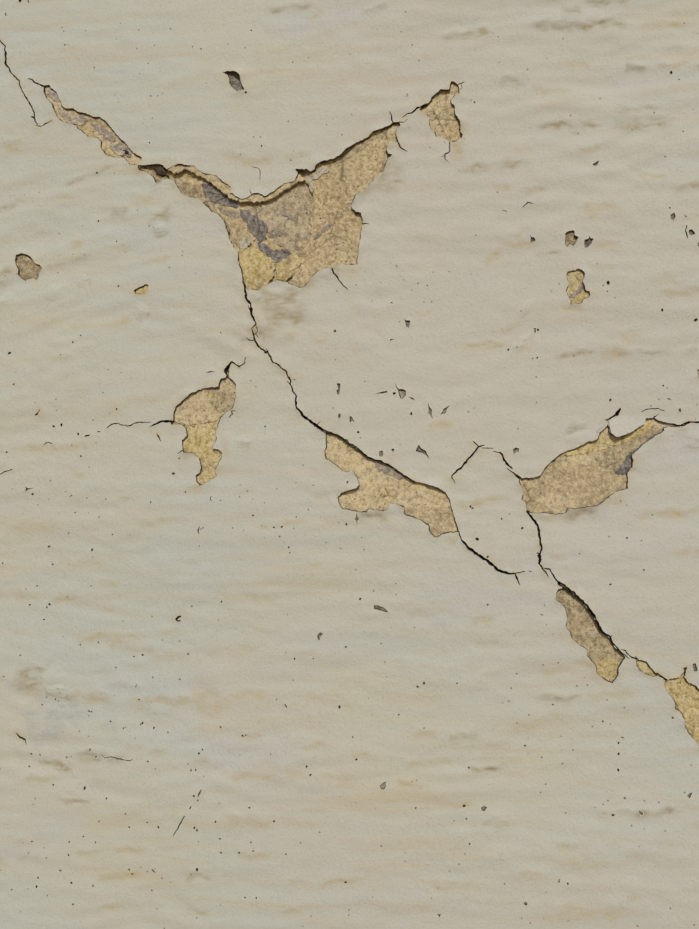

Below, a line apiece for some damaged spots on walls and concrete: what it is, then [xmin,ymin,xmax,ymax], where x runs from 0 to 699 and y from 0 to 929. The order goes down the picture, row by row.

crack [0,40,52,127]
peeling [420,81,463,142]
peeling [42,85,400,290]
crack [85,420,183,453]
peeling [169,372,236,486]
crack [206,281,416,483]
peeling [323,430,459,537]
crack [451,441,520,483]
peeling [516,415,684,515]
crack [605,408,664,421]
crack [459,510,639,660]
peeling [556,584,625,683]